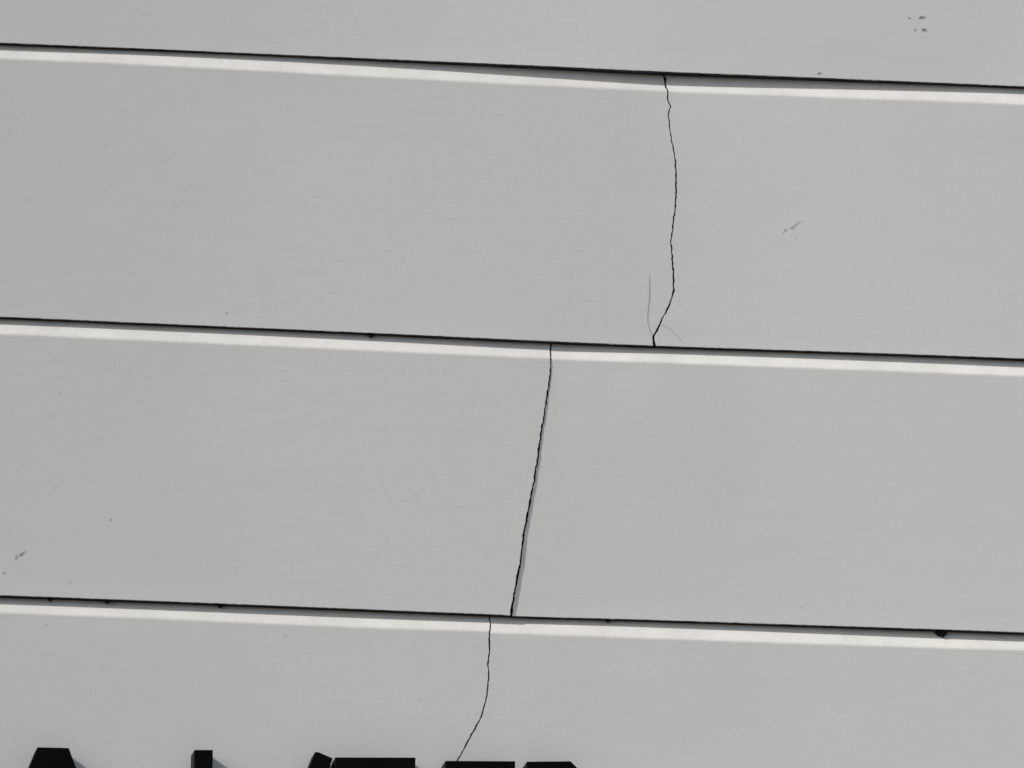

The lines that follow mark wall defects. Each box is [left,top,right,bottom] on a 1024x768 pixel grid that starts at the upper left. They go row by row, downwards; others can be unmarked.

crack [647,76,682,346]
crack [457,345,552,761]